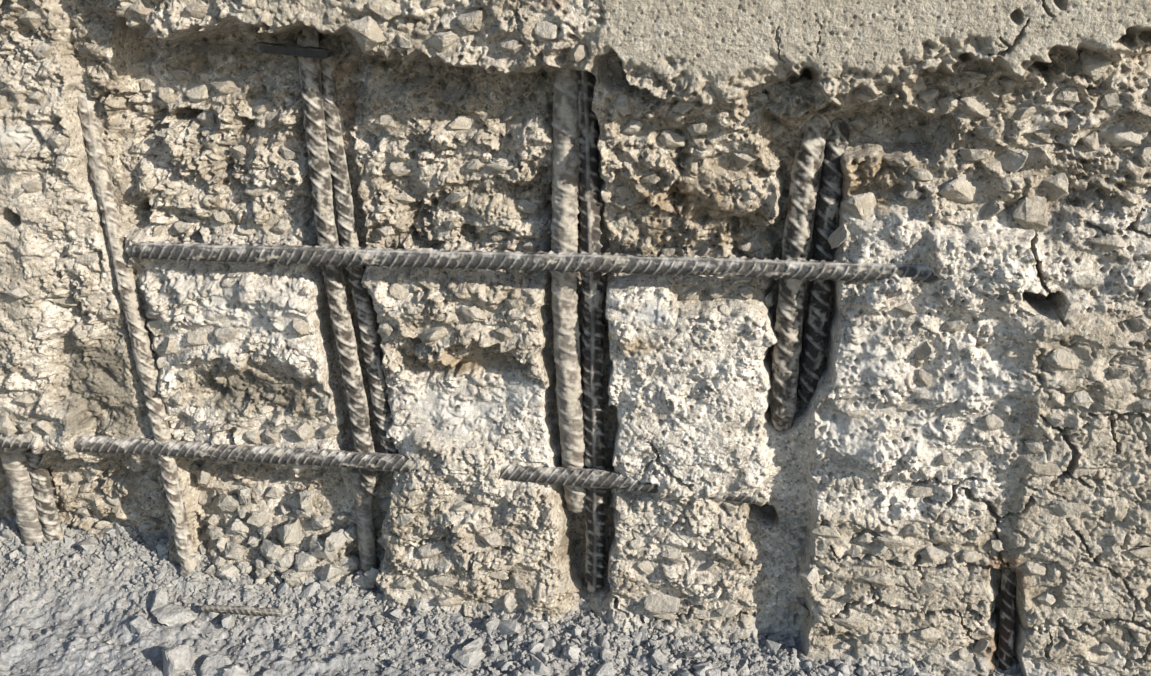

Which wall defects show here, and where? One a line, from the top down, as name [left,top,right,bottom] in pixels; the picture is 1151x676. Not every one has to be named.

crack [988,0,1056,57]
spalling [0,0,798,584]
spalling [765,27,1151,317]
spalling [131,181,1151,676]
crack [643,440,694,490]
crack [611,590,758,634]
crack [811,410,1151,670]